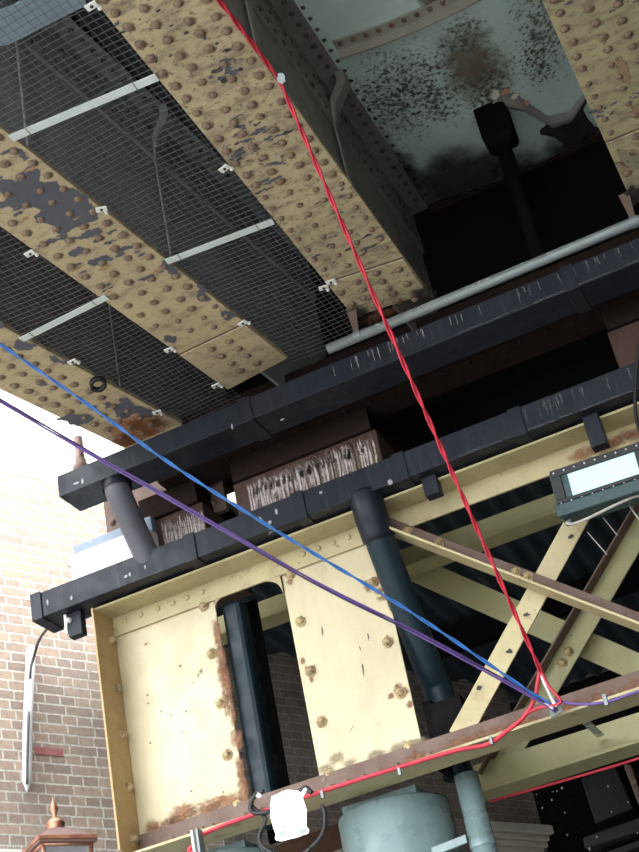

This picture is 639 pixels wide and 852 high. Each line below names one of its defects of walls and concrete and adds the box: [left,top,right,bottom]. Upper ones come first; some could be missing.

peeling [203,37,243,83]
damp [435,13,523,114]
peeling [222,114,293,167]
peeling [0,148,147,274]
peeling [623,185,639,206]
peeling [55,414,94,426]
peeling [103,397,154,419]
corrosion [111,417,166,447]
corrosion [214,621,241,748]
corrosion [591,681,639,702]
corrosion [446,726,508,749]
corrosion [147,760,247,832]